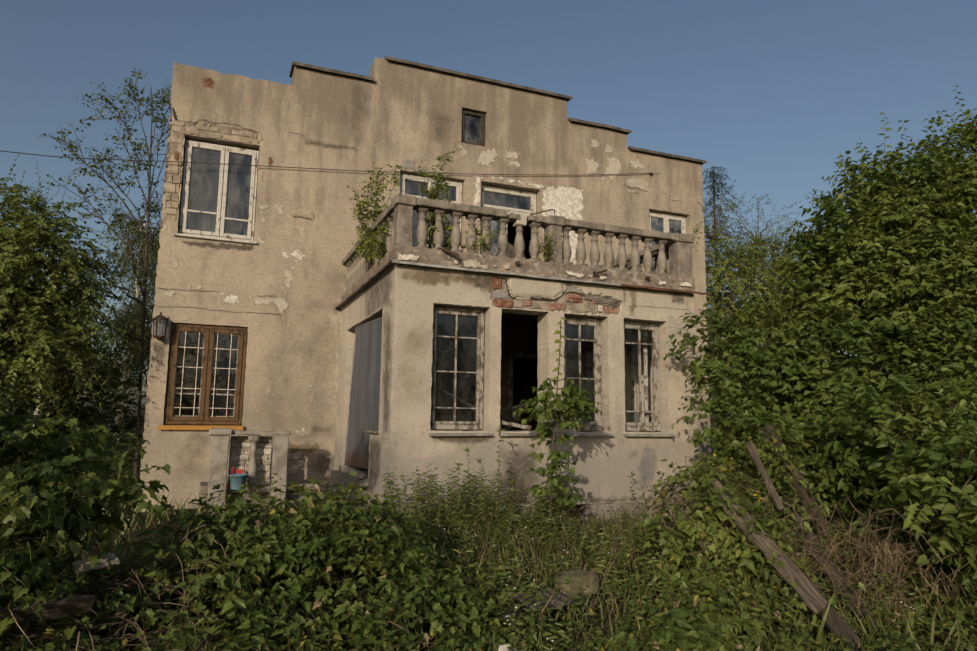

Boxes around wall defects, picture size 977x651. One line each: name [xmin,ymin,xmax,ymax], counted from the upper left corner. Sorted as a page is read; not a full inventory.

flaking render [585,138,649,193]
flaking render [452,148,622,315]
flaking render [215,249,306,313]